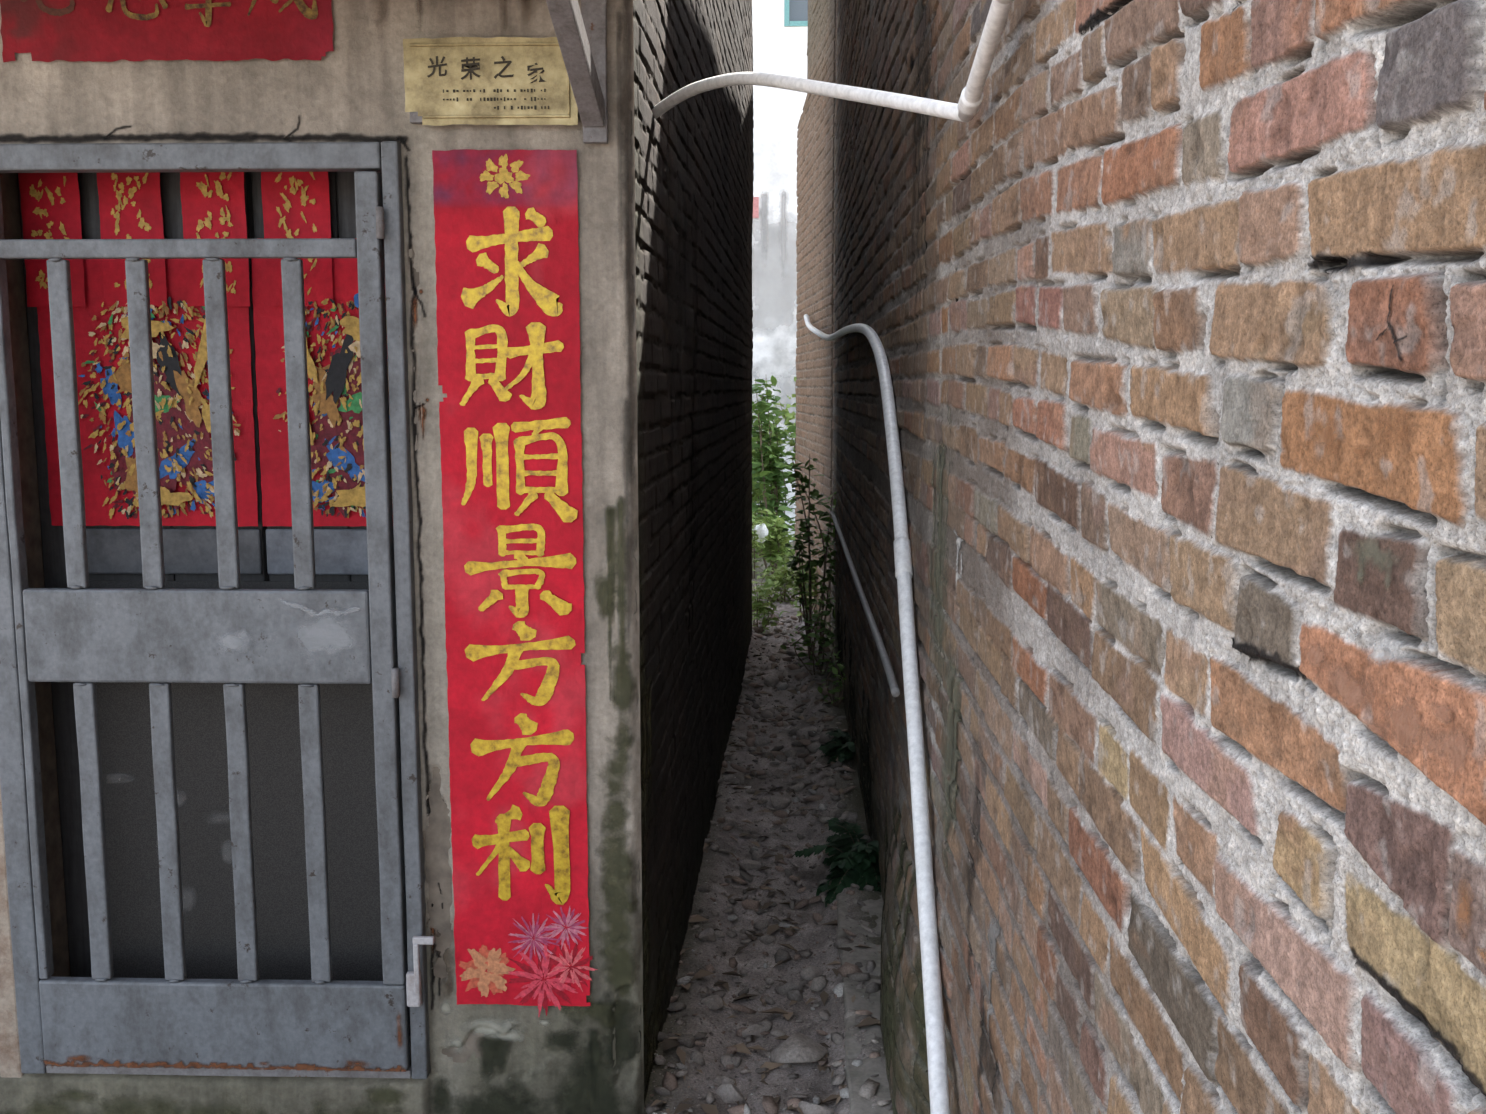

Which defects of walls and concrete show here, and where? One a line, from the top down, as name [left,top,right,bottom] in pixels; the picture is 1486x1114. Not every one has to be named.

crack [1376,286,1407,362]
leakage [606,498,625,668]
rust [44,1055,406,1072]
leakage [479,1038,509,1076]